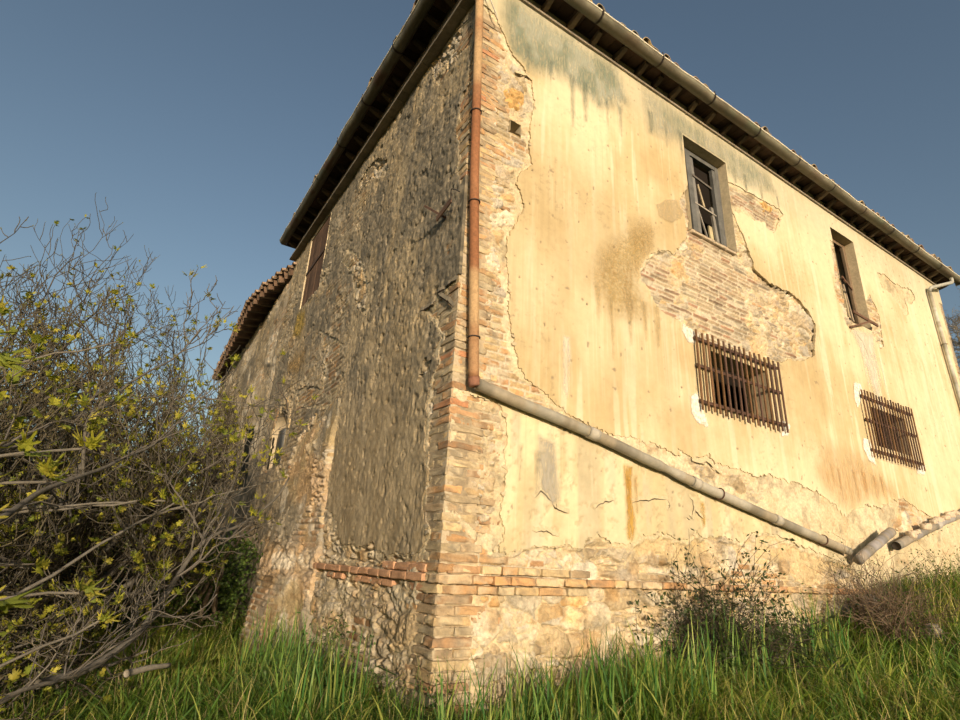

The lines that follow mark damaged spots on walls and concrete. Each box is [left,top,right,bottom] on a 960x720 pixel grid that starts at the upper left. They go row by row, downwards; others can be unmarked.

spalling [431,20,474,184]
water stain [601,232,648,312]
spalling [445,6,960,720]